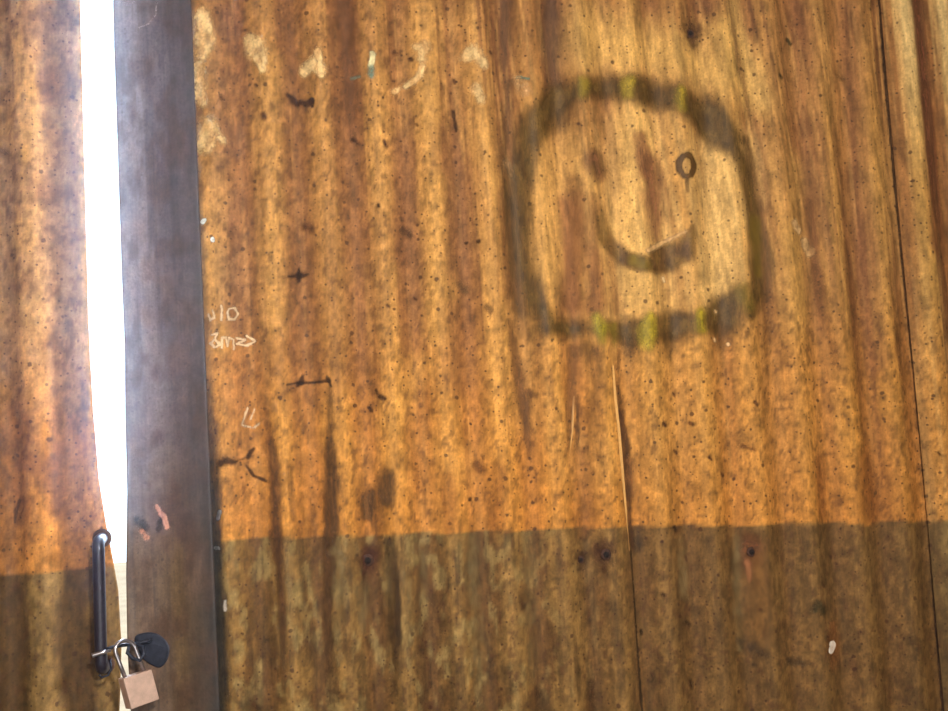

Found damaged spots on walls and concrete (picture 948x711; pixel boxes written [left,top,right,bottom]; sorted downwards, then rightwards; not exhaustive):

peeling [244,34,267,73]
peeling [299,48,326,78]
peeling [354,51,376,79]
peeling [392,40,430,94]
peeling [462,44,487,68]
peeling [472,83,485,103]
crack [878,0,944,711]